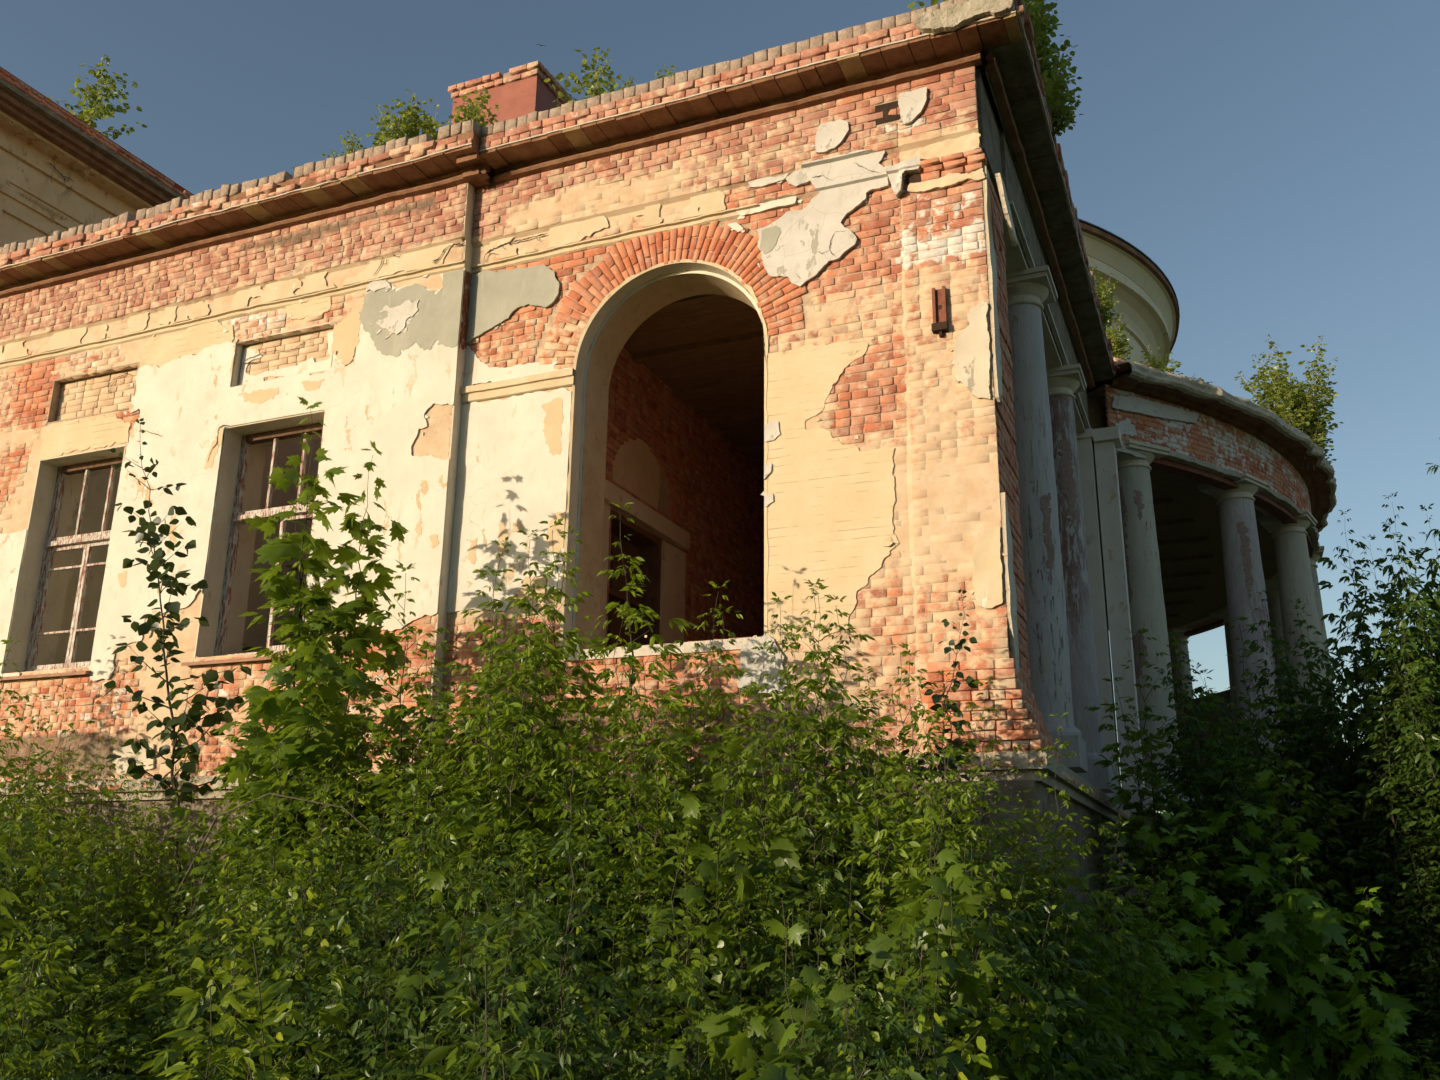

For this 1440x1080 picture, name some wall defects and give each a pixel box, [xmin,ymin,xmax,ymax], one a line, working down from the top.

flaking render [868,87,928,126]
flaking render [332,263,563,368]
spalling [728,120,922,456]
spalling [0,344,145,534]
peeling [204,427,223,469]
peeling [243,387,279,404]
peeling [302,379,325,391]
flaking render [760,463,775,507]
flaking render [969,492,1019,673]
peeling [1040,438,1077,585]
peeling [1119,486,1145,605]
spalling [57,608,223,730]